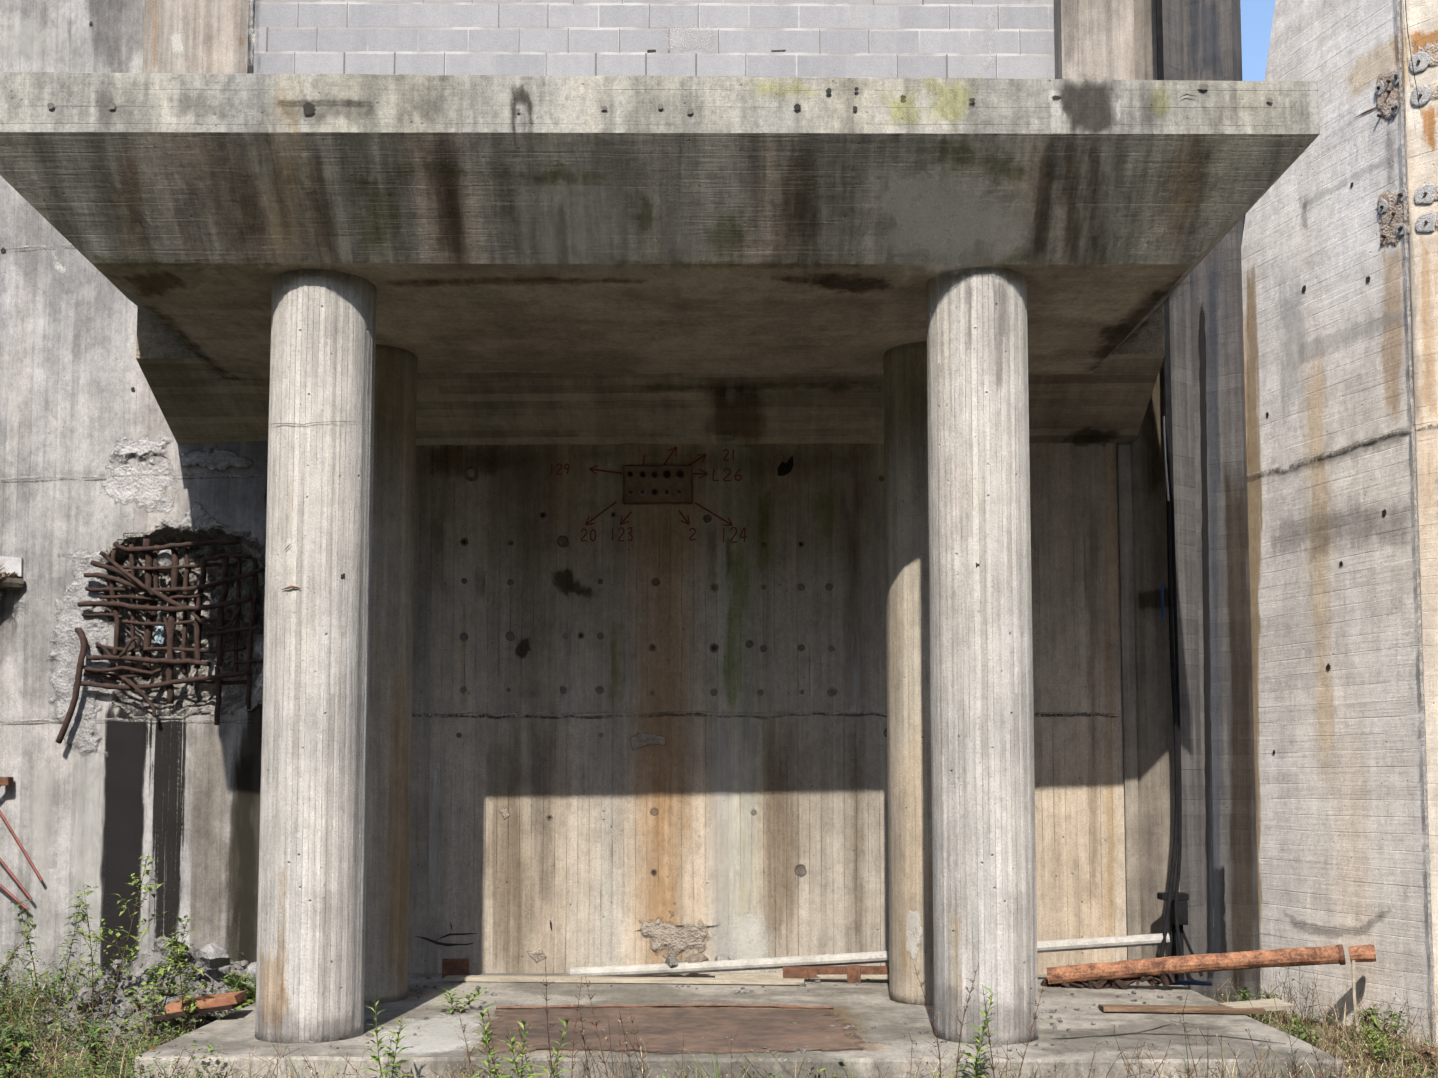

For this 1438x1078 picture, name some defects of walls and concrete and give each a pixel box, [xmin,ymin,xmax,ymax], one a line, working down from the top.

spalling [48,436,266,755]
water stain [100,701,186,975]
spalling [640,913,709,959]